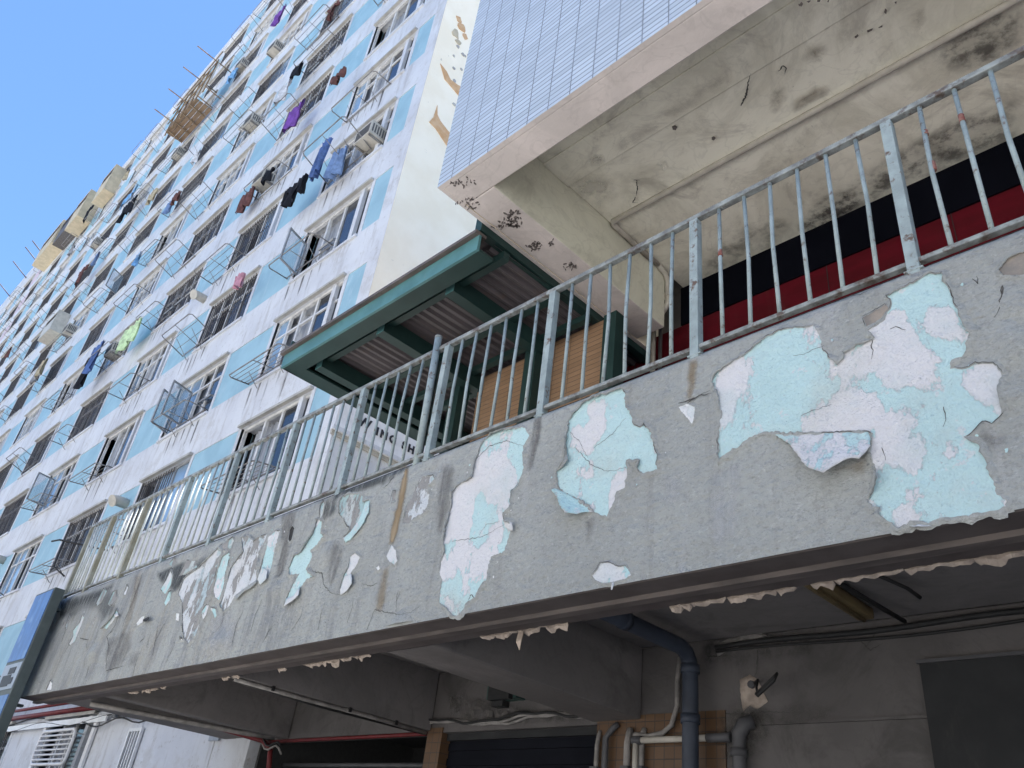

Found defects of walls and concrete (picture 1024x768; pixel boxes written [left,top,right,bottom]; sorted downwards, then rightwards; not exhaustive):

water stain [953,16,1015,62]
water stain [920,115,1004,160]
water stain [873,172,891,192]
water stain [804,193,861,229]
peeling [676,269,1015,535]
peeling [551,385,666,521]
corrosion [390,469,407,543]
peeling [438,424,533,620]
peeling [160,491,373,647]
peeling [589,560,632,590]
peeling [810,550,1024,590]
peeling [669,587,797,613]